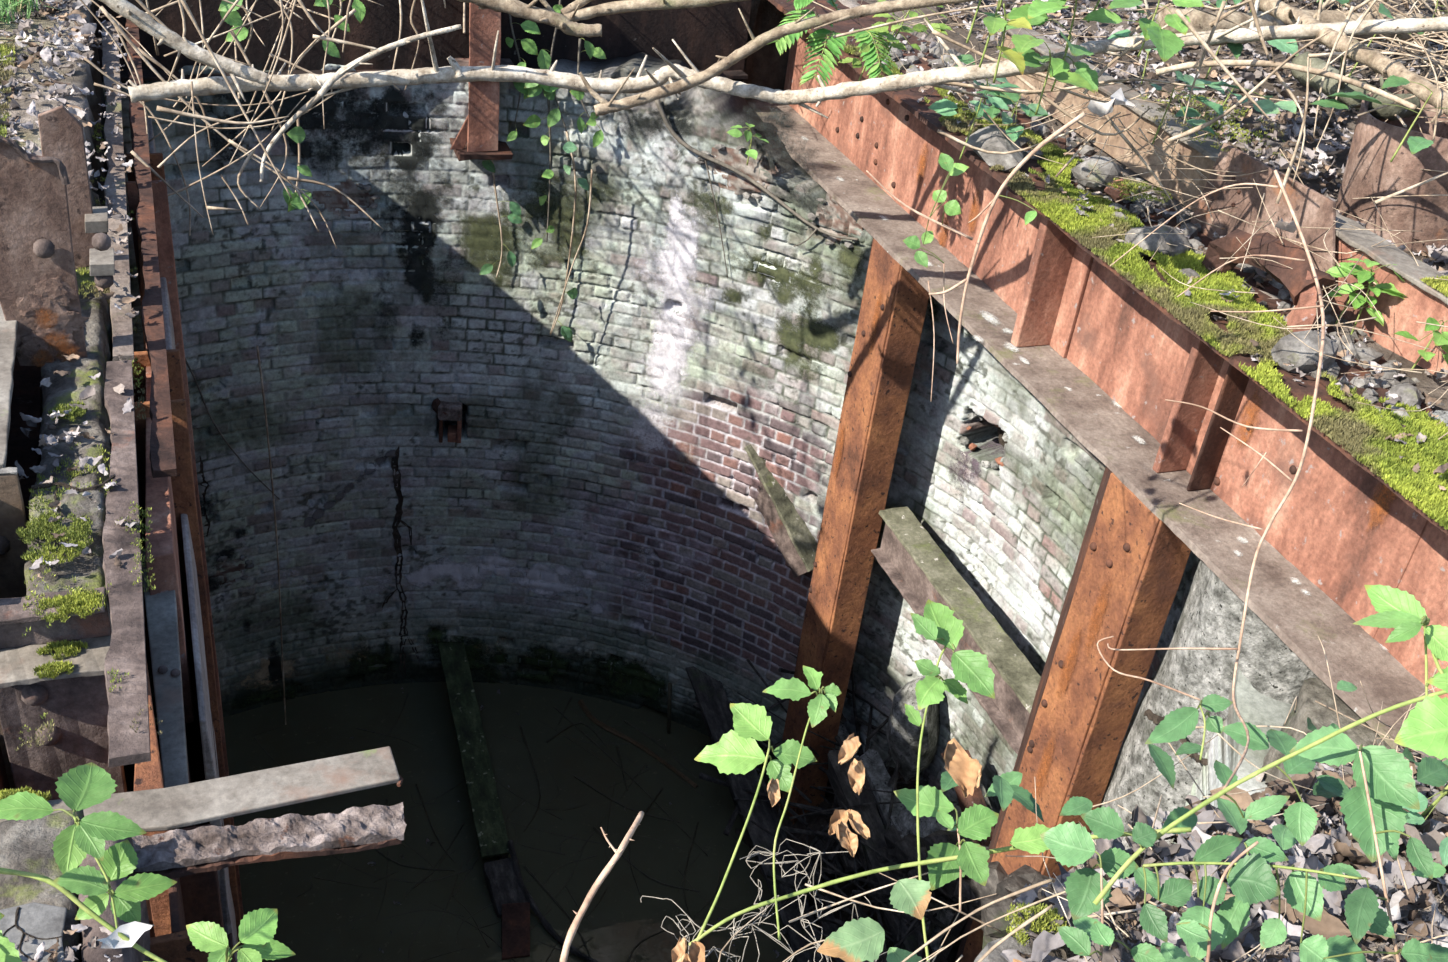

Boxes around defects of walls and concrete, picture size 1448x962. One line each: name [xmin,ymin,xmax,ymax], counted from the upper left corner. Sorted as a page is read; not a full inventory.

water stain [204,70,454,302]
rust [32,309,76,368]
water stain [408,317,453,347]
efflorescence [627,194,712,450]
spalling [960,413,1008,469]
crack [382,446,419,678]
water stain [424,625,667,710]